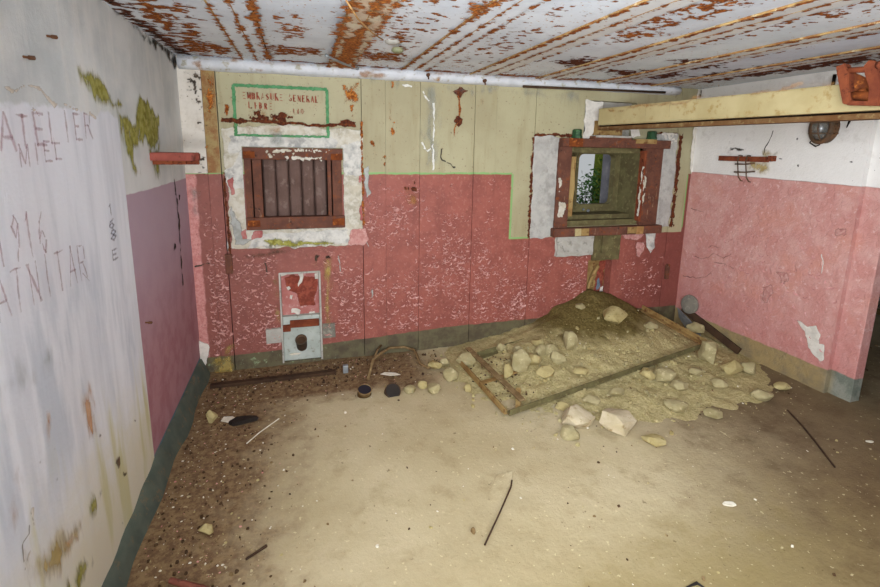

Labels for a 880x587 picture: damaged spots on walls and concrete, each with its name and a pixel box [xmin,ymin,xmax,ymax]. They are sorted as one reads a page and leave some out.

water stain [78,69,159,174]
flaking render [199,124,588,365]
peeling [797,321,825,361]